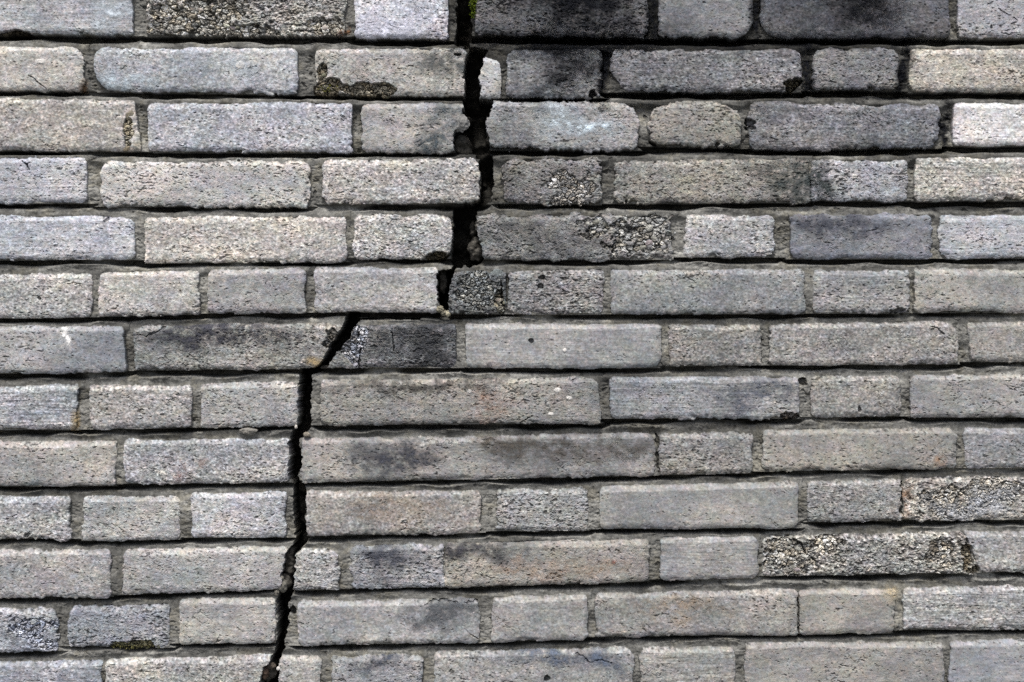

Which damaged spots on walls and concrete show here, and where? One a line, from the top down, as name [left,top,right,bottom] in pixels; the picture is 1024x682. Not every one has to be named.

crack [259,0,495,682]